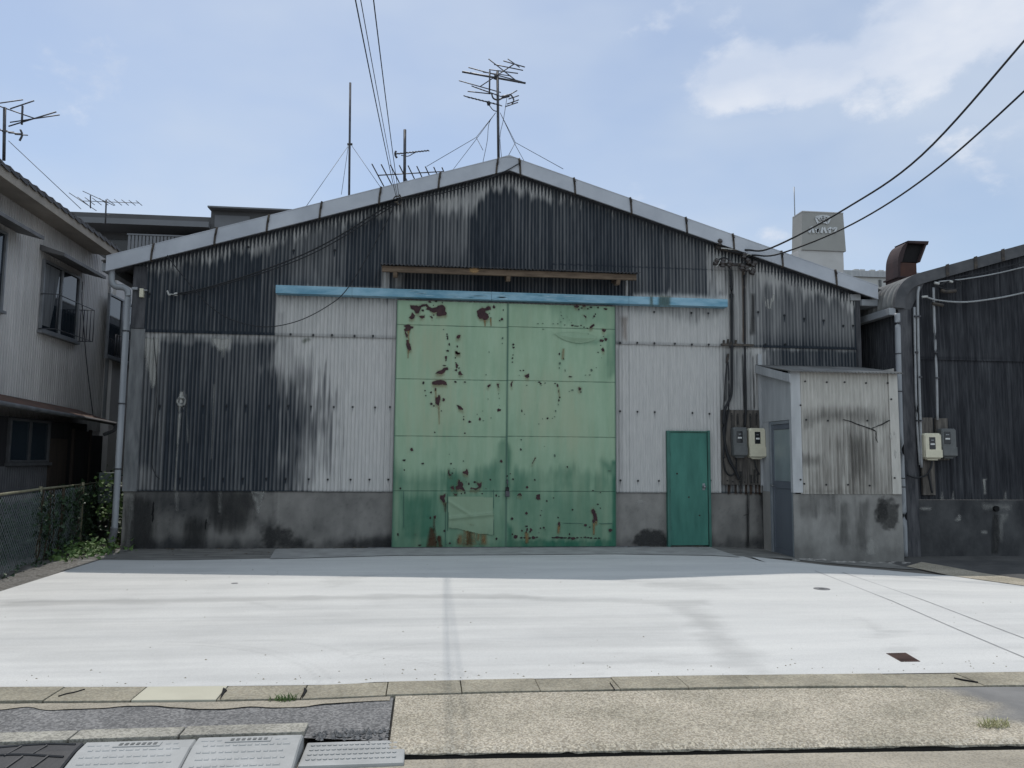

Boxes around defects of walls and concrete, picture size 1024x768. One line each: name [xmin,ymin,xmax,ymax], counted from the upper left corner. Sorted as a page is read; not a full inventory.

water stain [145,338,158,386]
water stain [126,497,151,547]
water stain [875,499,898,528]
water stain [263,527,301,547]
rust [427,528,441,547]
water stain [634,529,667,546]